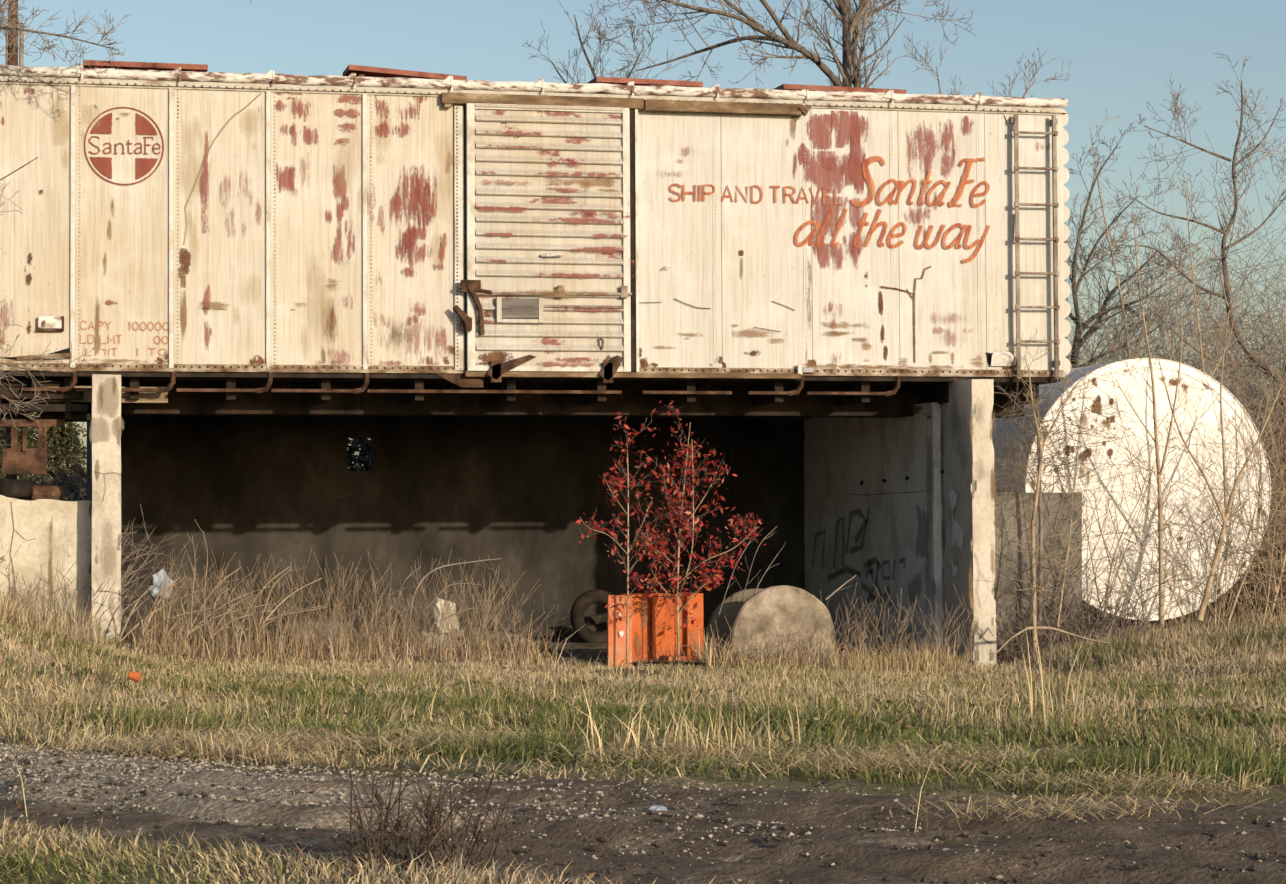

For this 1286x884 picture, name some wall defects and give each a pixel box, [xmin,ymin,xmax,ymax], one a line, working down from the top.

peeling [275,92,319,146]
peeling [334,95,427,146]
peeling [276,163,295,192]
peeling [326,164,355,266]
peeling [390,164,447,277]
peeling [475,110,635,278]
peeling [793,110,868,270]
peeling [904,116,972,239]
corrosion [178,248,191,334]
corrosion [475,351,512,366]
peeling [533,337,608,367]